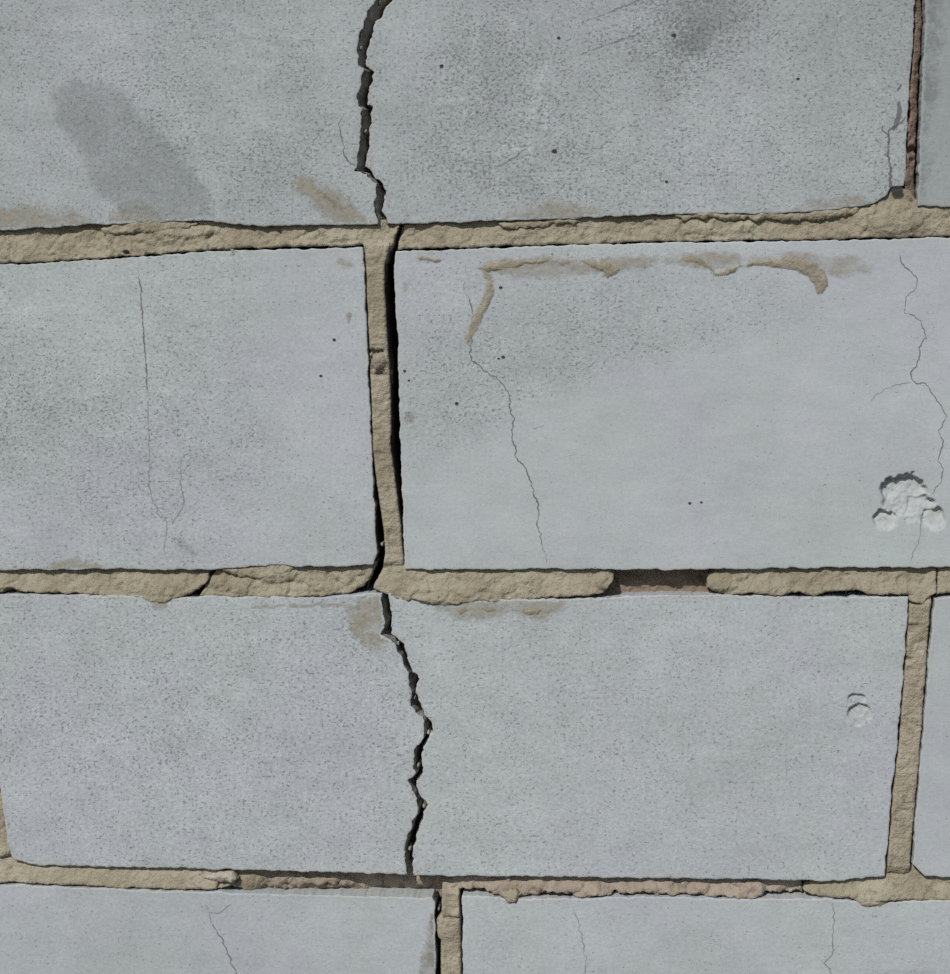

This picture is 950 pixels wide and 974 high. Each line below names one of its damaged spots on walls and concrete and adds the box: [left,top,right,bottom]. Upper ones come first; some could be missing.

crack [338,0,433,873]
crack [469,340,547,562]
crack [900,257,947,492]
crack [434,892,442,974]